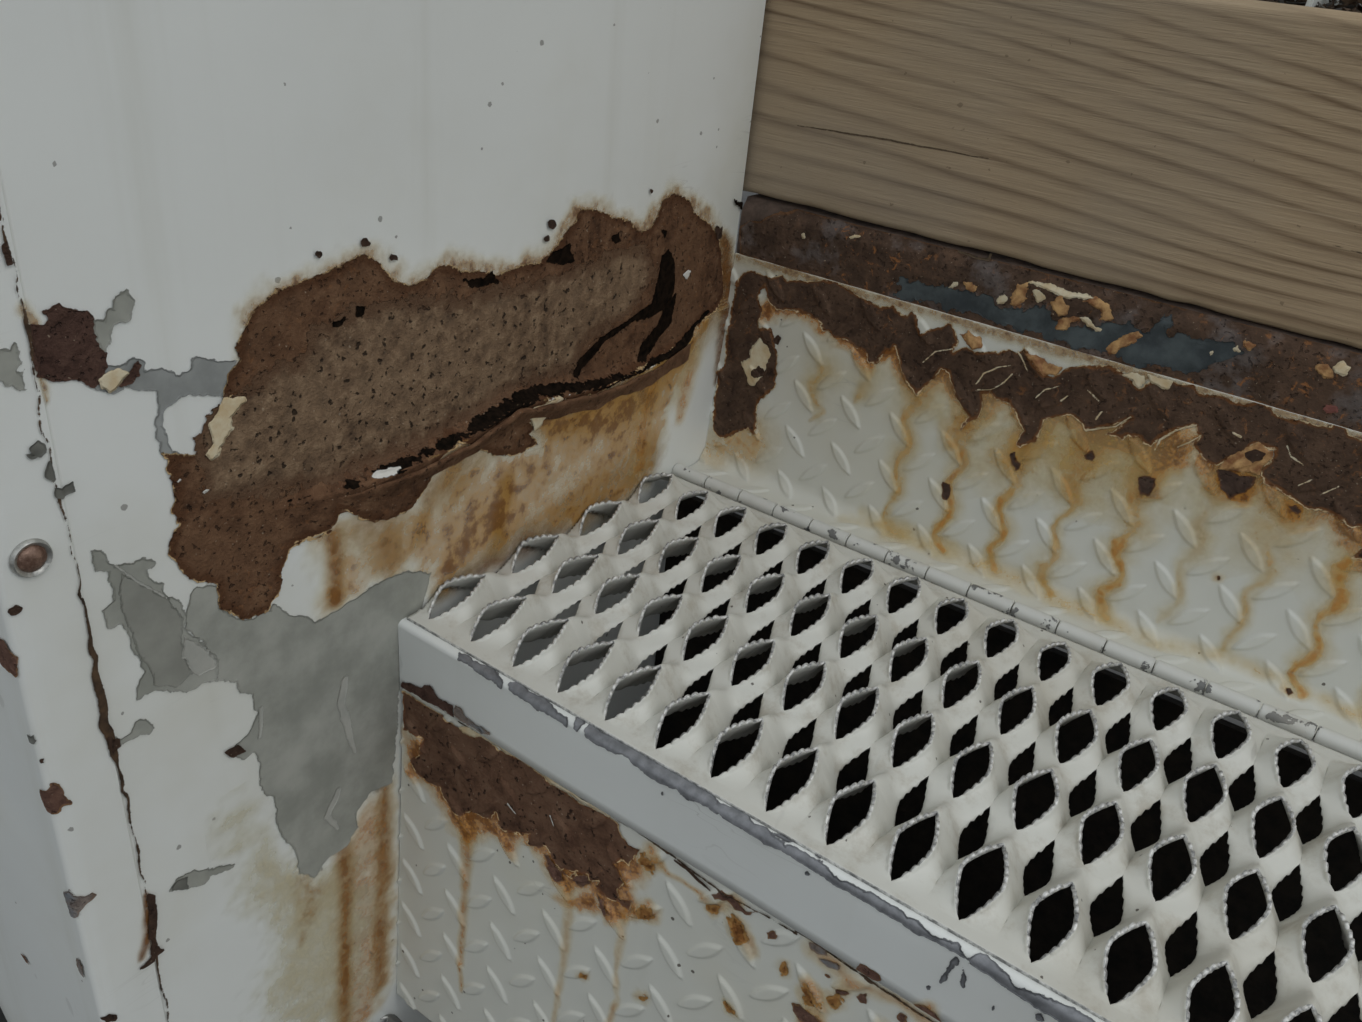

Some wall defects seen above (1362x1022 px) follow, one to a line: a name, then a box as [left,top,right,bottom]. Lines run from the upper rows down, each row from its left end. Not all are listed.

peeling [0,342,27,391]
peeling [95,356,237,456]
rust [161,187,1362,698]
crack [2,219,169,1021]
peeling [91,549,490,878]
rust [401,691,656,972]
rust [706,905,749,945]
rust [801,982,845,1010]